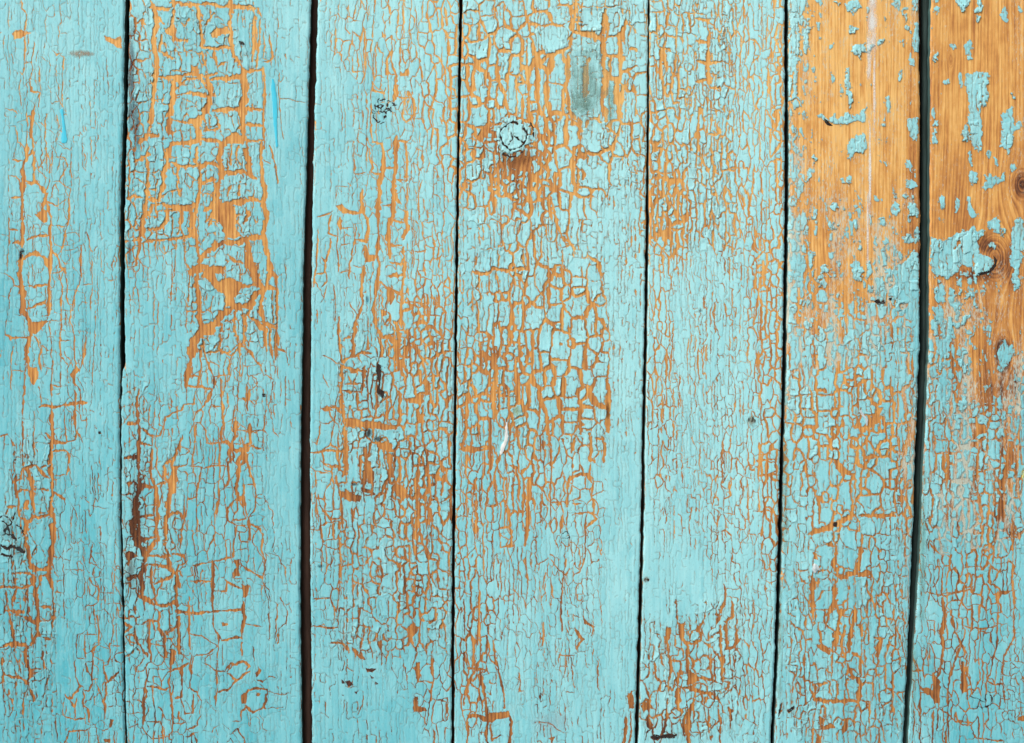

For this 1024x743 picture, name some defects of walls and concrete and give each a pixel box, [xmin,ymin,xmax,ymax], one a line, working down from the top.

peeling [104,0,283,365]
crack [0,0,459,743]
peeling [323,0,742,685]
crack [404,0,785,743]
peeling [774,0,1024,743]
crack [910,554,1024,743]